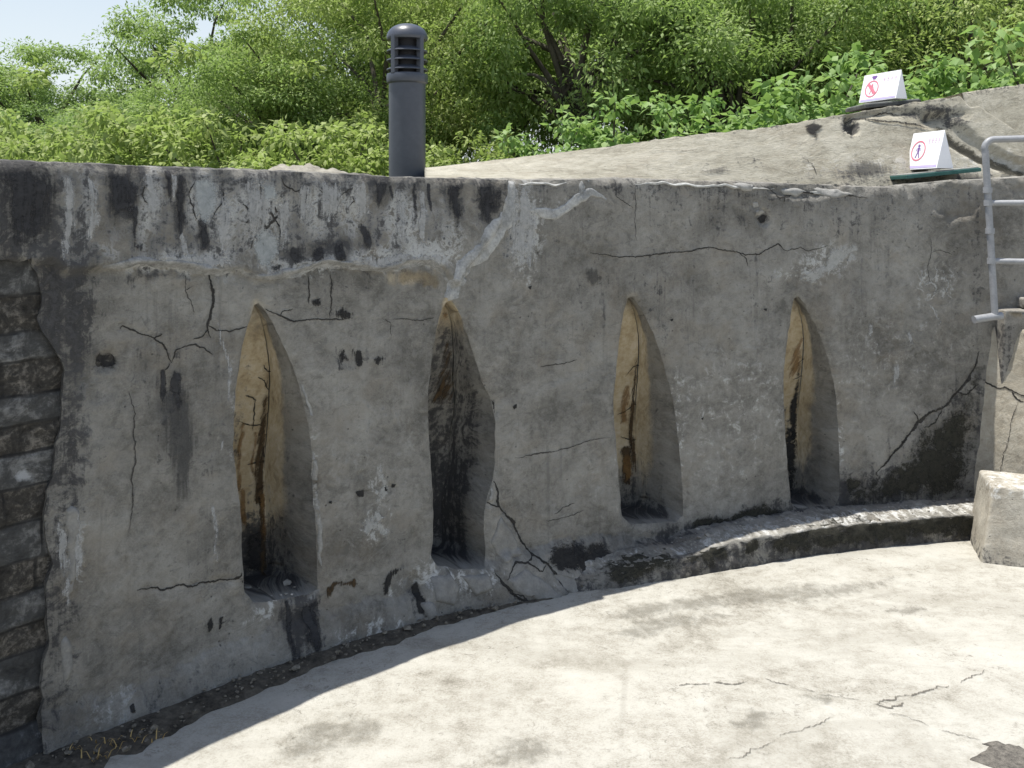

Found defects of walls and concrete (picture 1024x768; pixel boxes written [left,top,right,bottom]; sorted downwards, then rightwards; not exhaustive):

leakage [3,169,74,257]
leakage [106,170,230,267]
leakage [247,182,441,269]
crack [593,190,828,266]
crack [120,275,247,370]
leakage [160,370,193,495]
rust [238,380,268,576]
rust [621,378,637,485]
crack [876,352,1024,474]
crack [487,481,563,602]
mould [550,540,612,573]
crack [681,670,984,758]